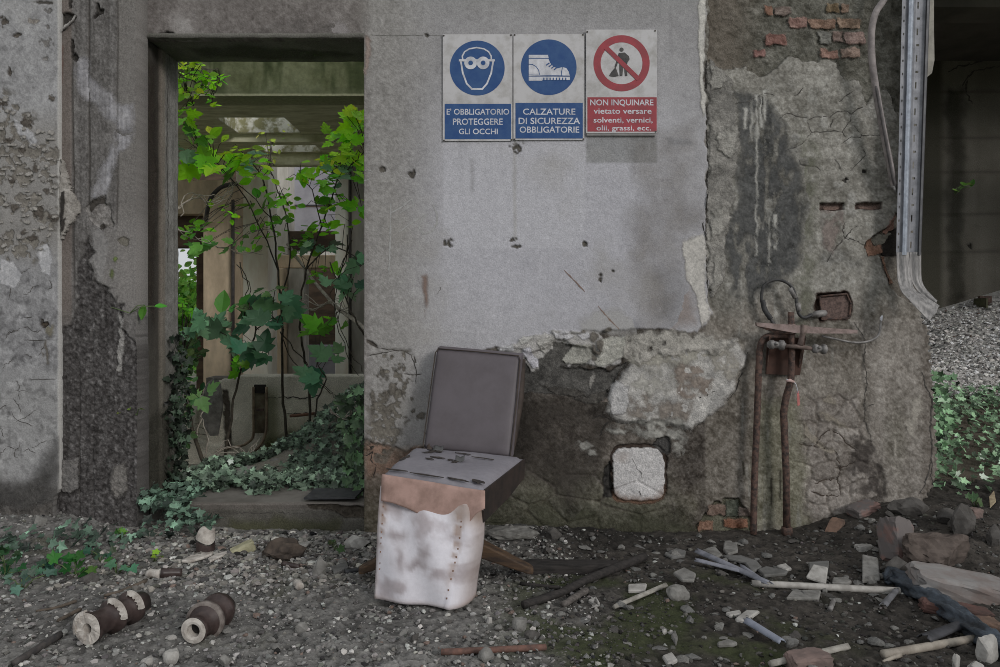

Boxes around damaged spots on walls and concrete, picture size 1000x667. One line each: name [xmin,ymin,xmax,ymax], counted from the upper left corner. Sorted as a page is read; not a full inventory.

peeling [0,89,114,289]
water stain [725,88,805,301]
flaking render [682,0,905,326]
crack [736,88,880,171]
flaking render [864,214,913,302]
spalling [0,239,138,527]
peeling [365,340,426,458]
flaking render [498,327,628,404]
flaking render [603,461,613,497]
peeling [608,417,685,454]
crack [799,324,874,497]
crack [920,373,934,493]